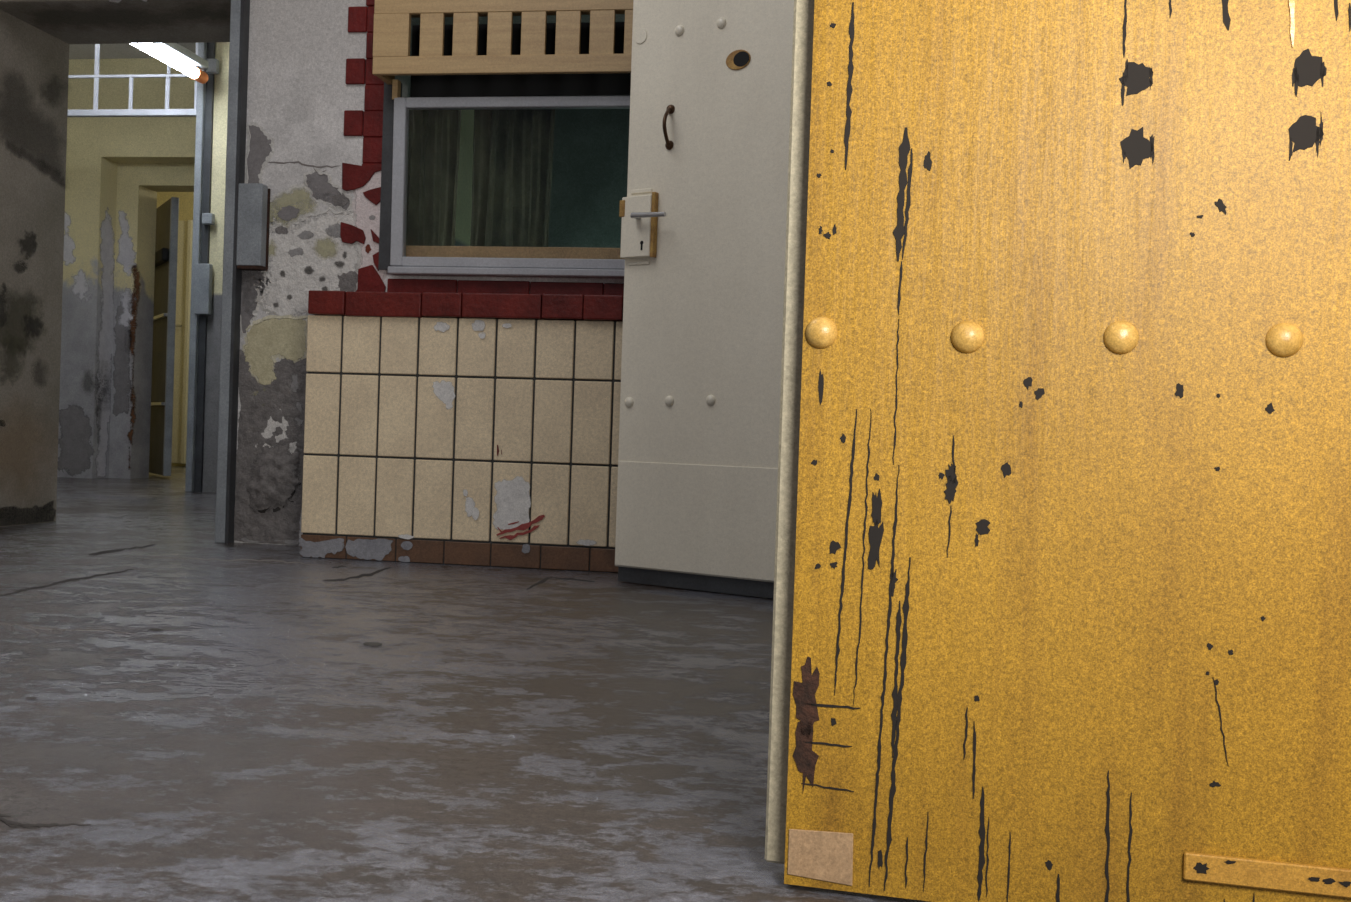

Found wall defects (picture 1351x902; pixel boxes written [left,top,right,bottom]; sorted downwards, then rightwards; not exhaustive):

flaking render [245,122,275,183]
damp [15,232,37,273]
flaking render [113,296,132,416]
flaking render [234,168,414,562]
crack [0,544,156,597]
crack [325,565,391,581]
crack [0,814,91,829]